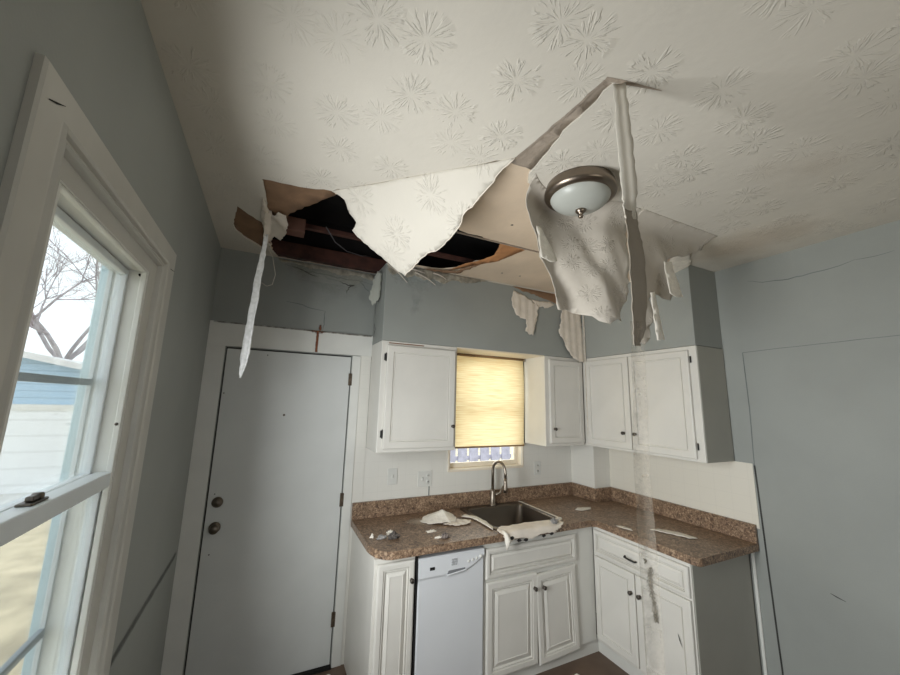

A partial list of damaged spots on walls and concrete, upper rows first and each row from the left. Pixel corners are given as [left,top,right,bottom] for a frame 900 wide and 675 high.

peeling [369,263,407,305]
peeling [669,255,691,273]
peeling [511,291,584,363]